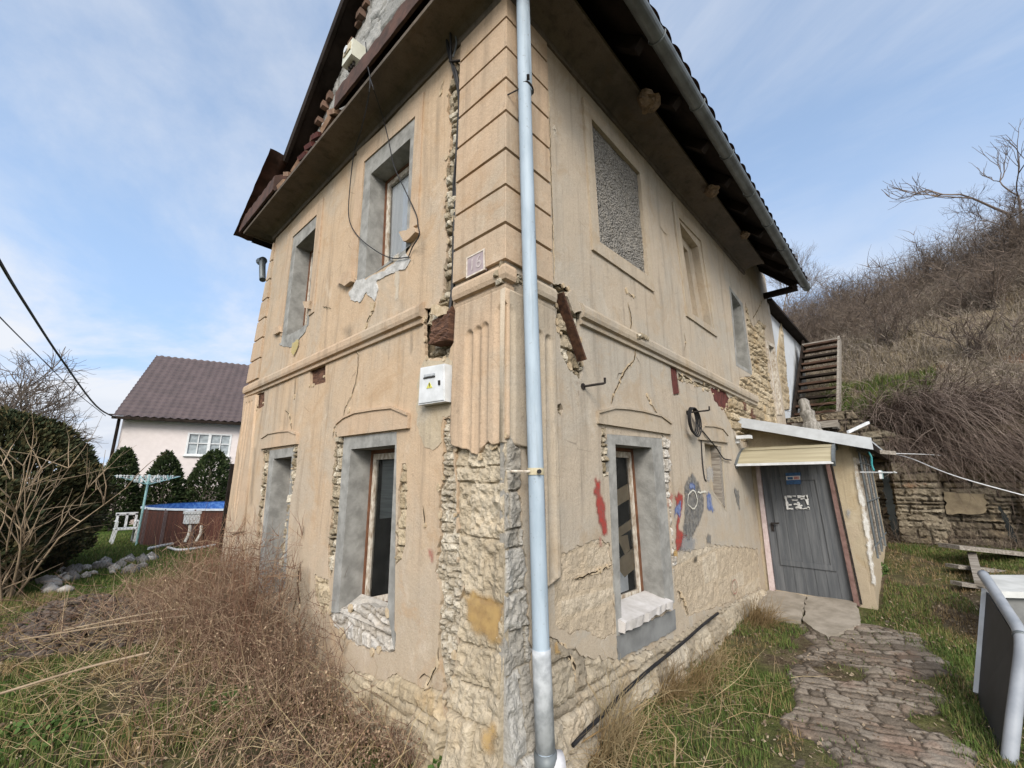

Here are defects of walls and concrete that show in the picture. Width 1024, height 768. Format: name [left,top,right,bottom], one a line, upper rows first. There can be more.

crack [332,311,374,438]
peeling [348,253,411,312]
flaking render [553,283,584,378]
crack [611,287,641,404]
flaking render [677,306,790,442]
flaking render [601,428,610,477]
flaking render [285,432,535,768]
flaking render [549,437,767,768]